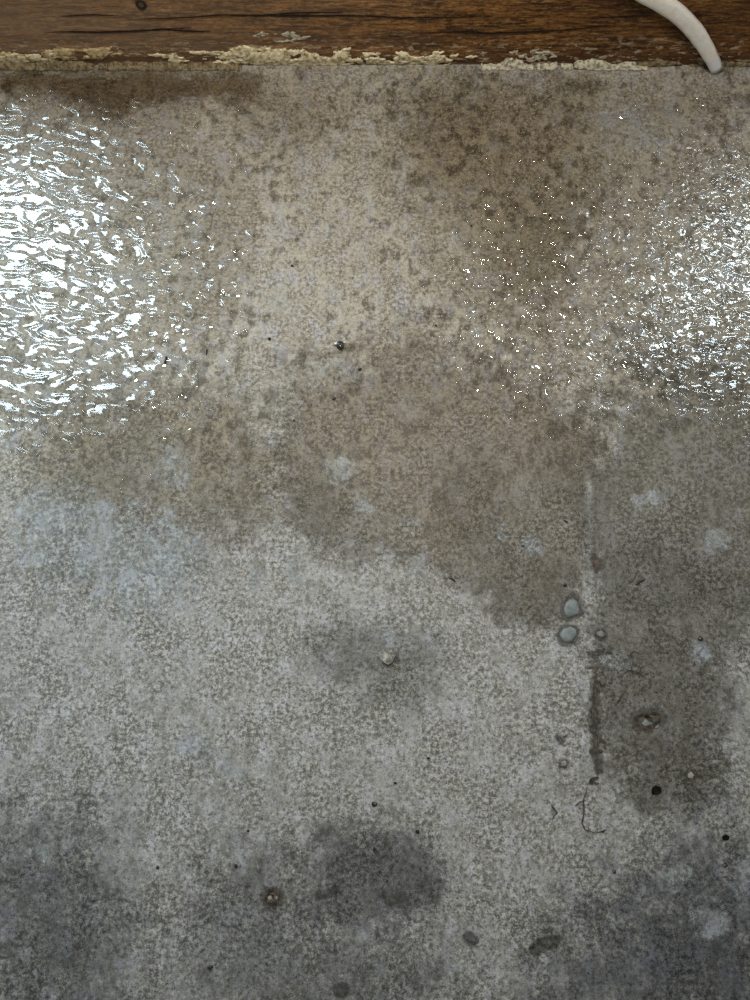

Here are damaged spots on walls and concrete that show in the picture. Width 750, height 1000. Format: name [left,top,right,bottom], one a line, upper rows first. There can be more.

peeling [0,46,124,63]
peeling [148,31,478,66]
peeling [509,48,557,62]
water stain [0,70,260,119]
water stain [21,327,750,812]
crack [551,649,644,833]
water stain [199,832,441,1000]